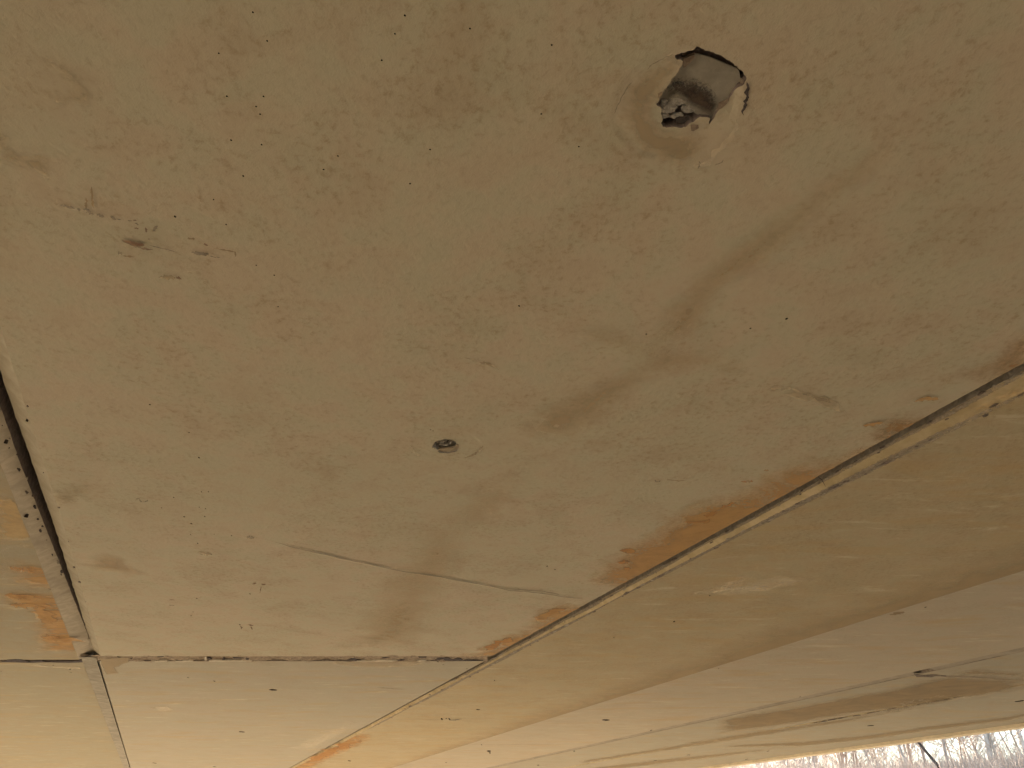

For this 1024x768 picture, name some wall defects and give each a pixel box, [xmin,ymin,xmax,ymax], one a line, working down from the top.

hole [656,47,746,131]
corrosion [604,464,840,584]
corrosion [5,567,82,650]
crack [283,544,581,599]
corrosion [484,608,578,656]